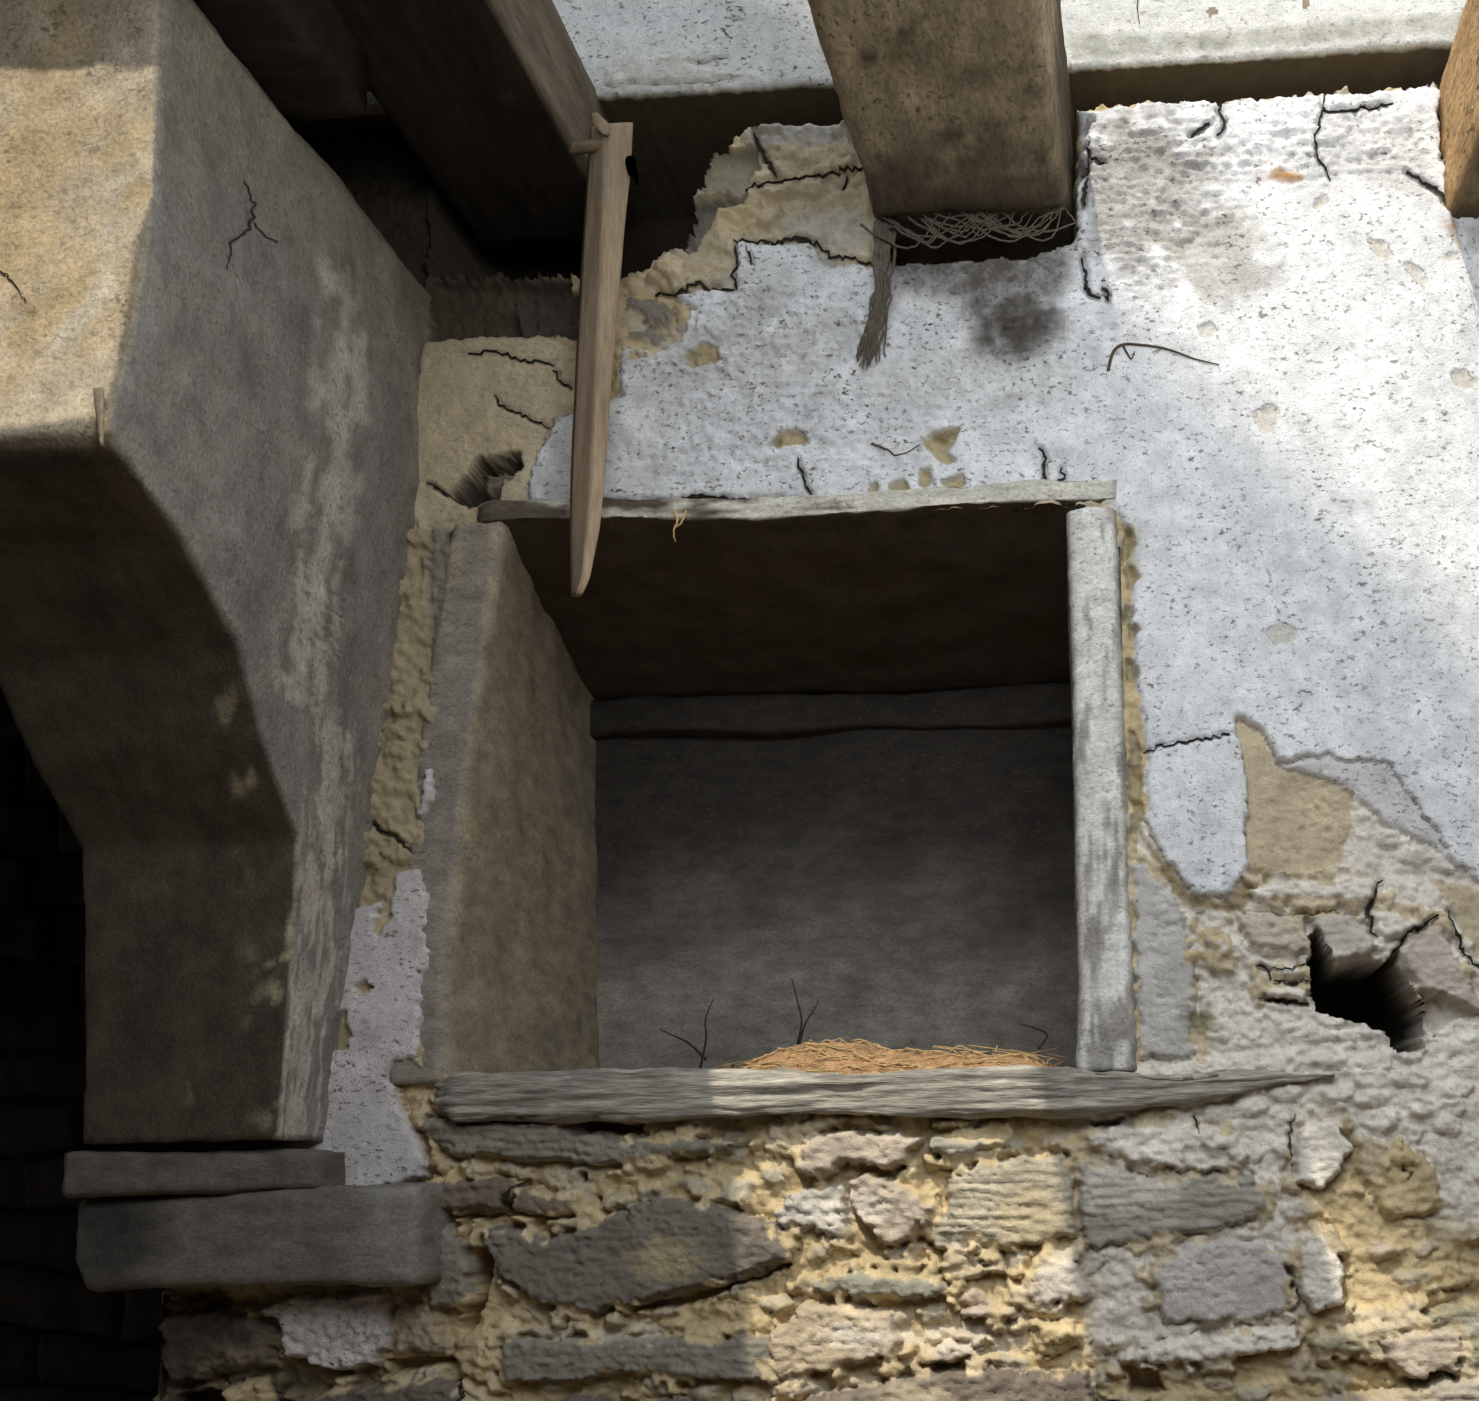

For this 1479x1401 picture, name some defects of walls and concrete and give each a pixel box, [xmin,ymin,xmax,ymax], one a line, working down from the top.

flaking render [641,120,875,298]
crack [655,235,873,297]
crack [745,131,863,199]
crack [1076,146,1110,302]
crack [1313,93,1393,181]
flaking render [683,340,720,369]
flaking render [1122,524,1140,640]
flaking render [1125,658,1138,682]
flaking render [1128,720,1479,1074]
crack [1365,880,1479,968]
flaking render [279,869,431,1186]
crack [1256,963,1309,1005]